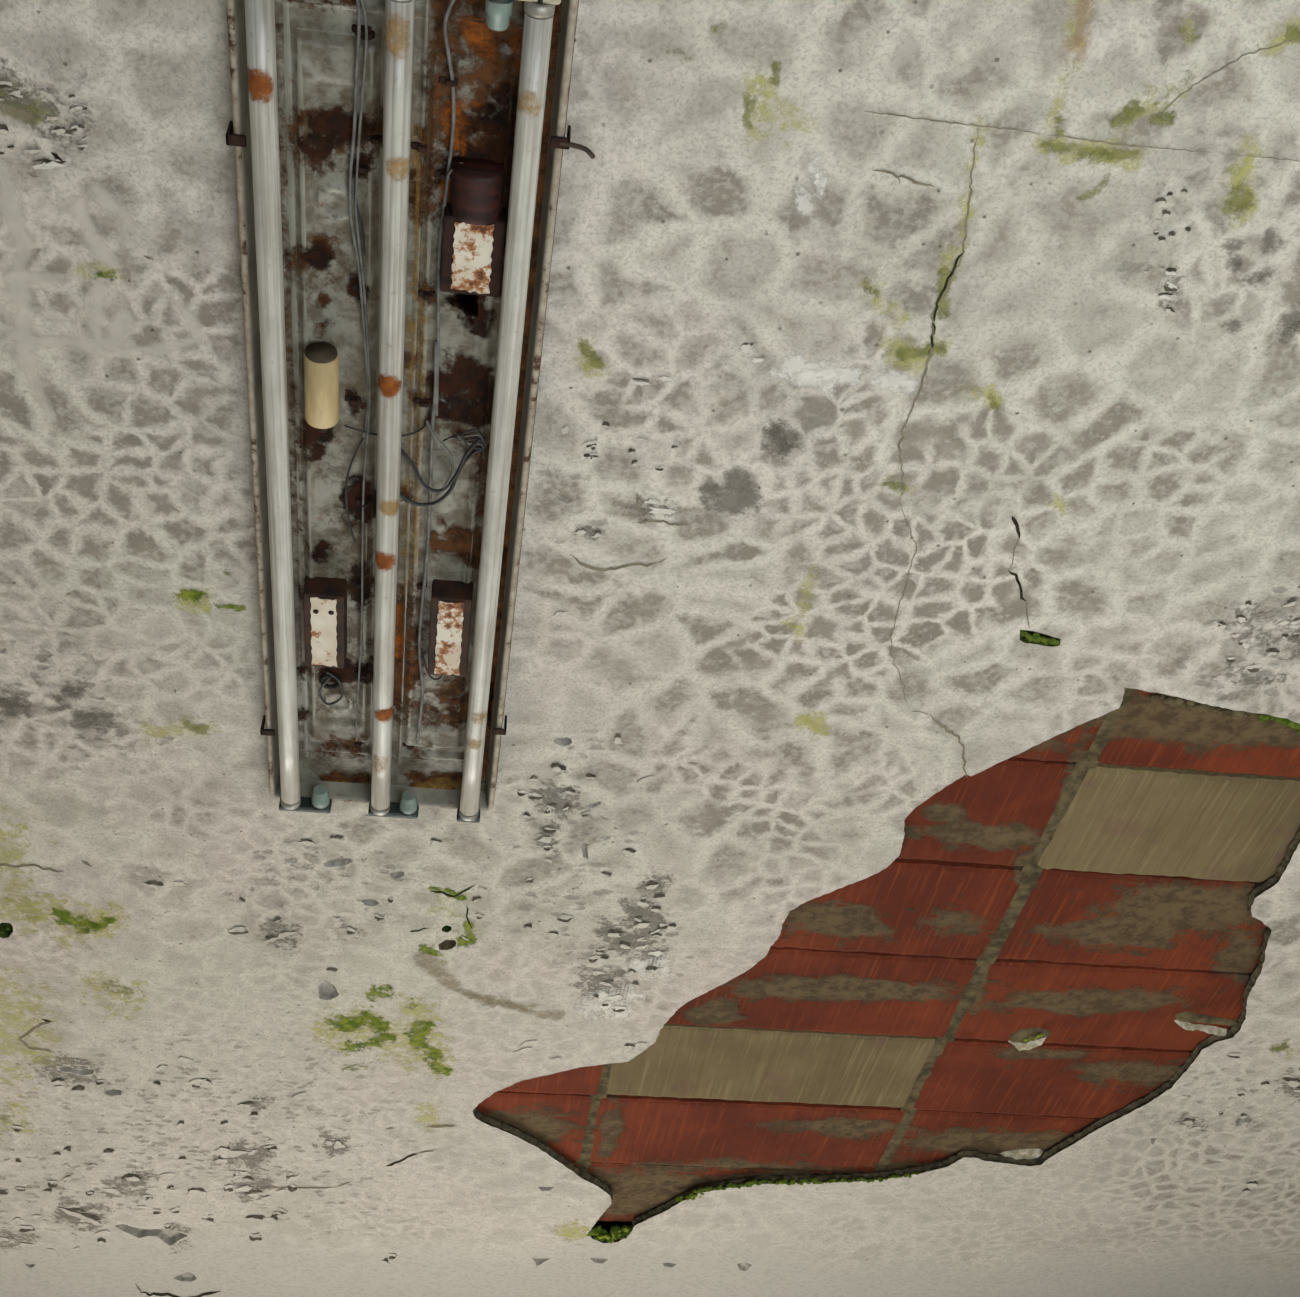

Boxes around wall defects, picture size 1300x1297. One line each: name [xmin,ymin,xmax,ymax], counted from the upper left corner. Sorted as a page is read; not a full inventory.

crack [866,37,1300,777]
flaking render [476,586,1300,1264]